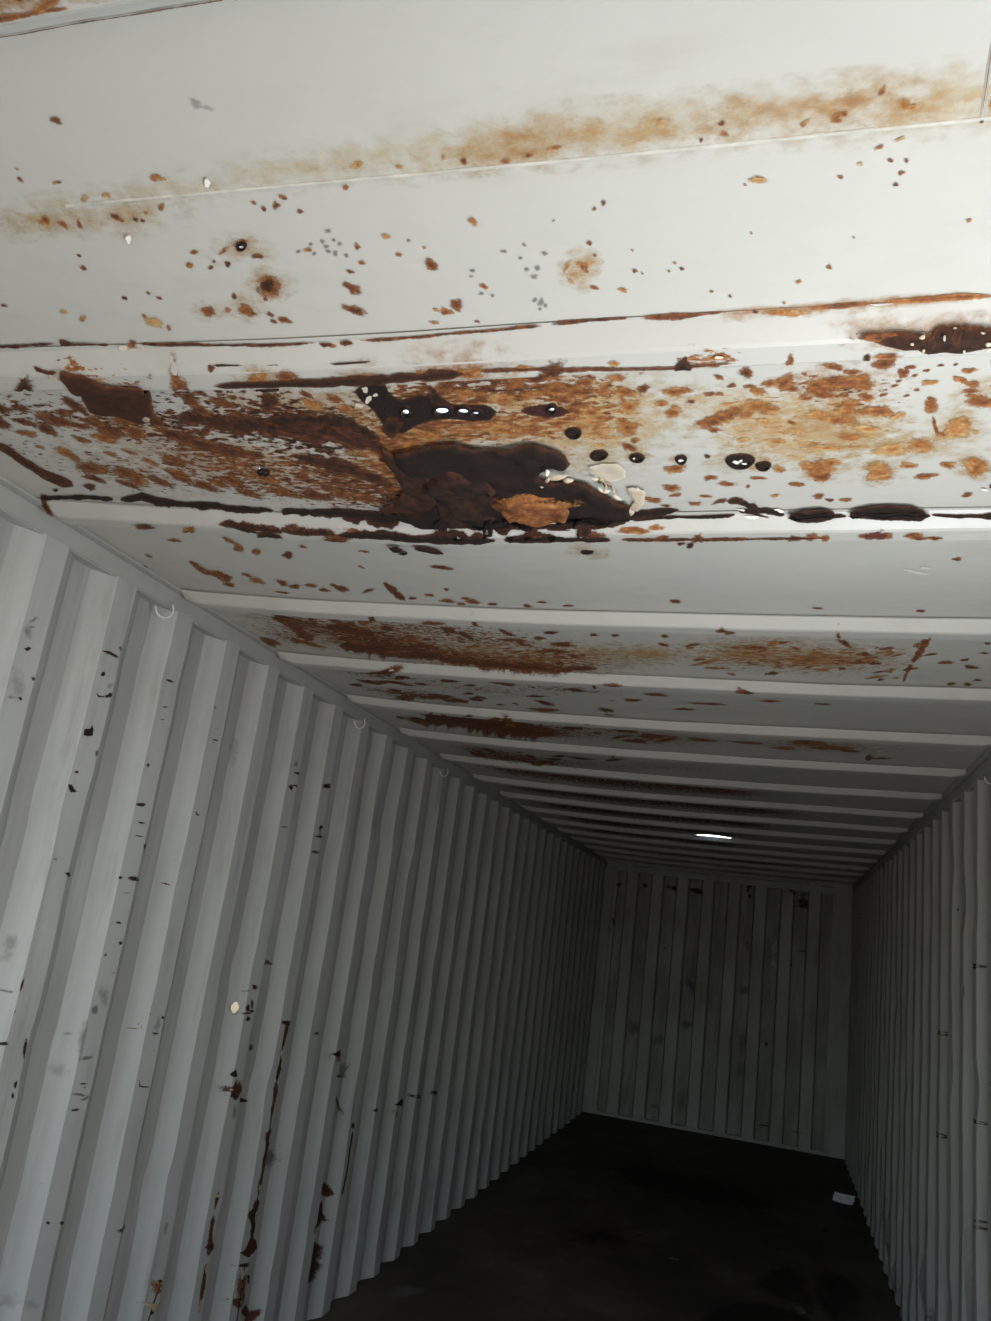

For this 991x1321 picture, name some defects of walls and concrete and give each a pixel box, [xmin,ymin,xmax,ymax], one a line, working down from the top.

corrosion [0,0,67,23]
corrosion [738,86,991,186]
corrosion [209,239,263,270]
corrosion [201,276,293,324]
corrosion [342,242,365,316]
corrosion [429,300,462,324]
corrosion [0,348,991,510]
peeling [589,464,646,516]
corrosion [189,561,498,606]
corrosion [251,614,990,865]
corrosion [226,1021,291,1321]
corrosion [308,1182,334,1283]